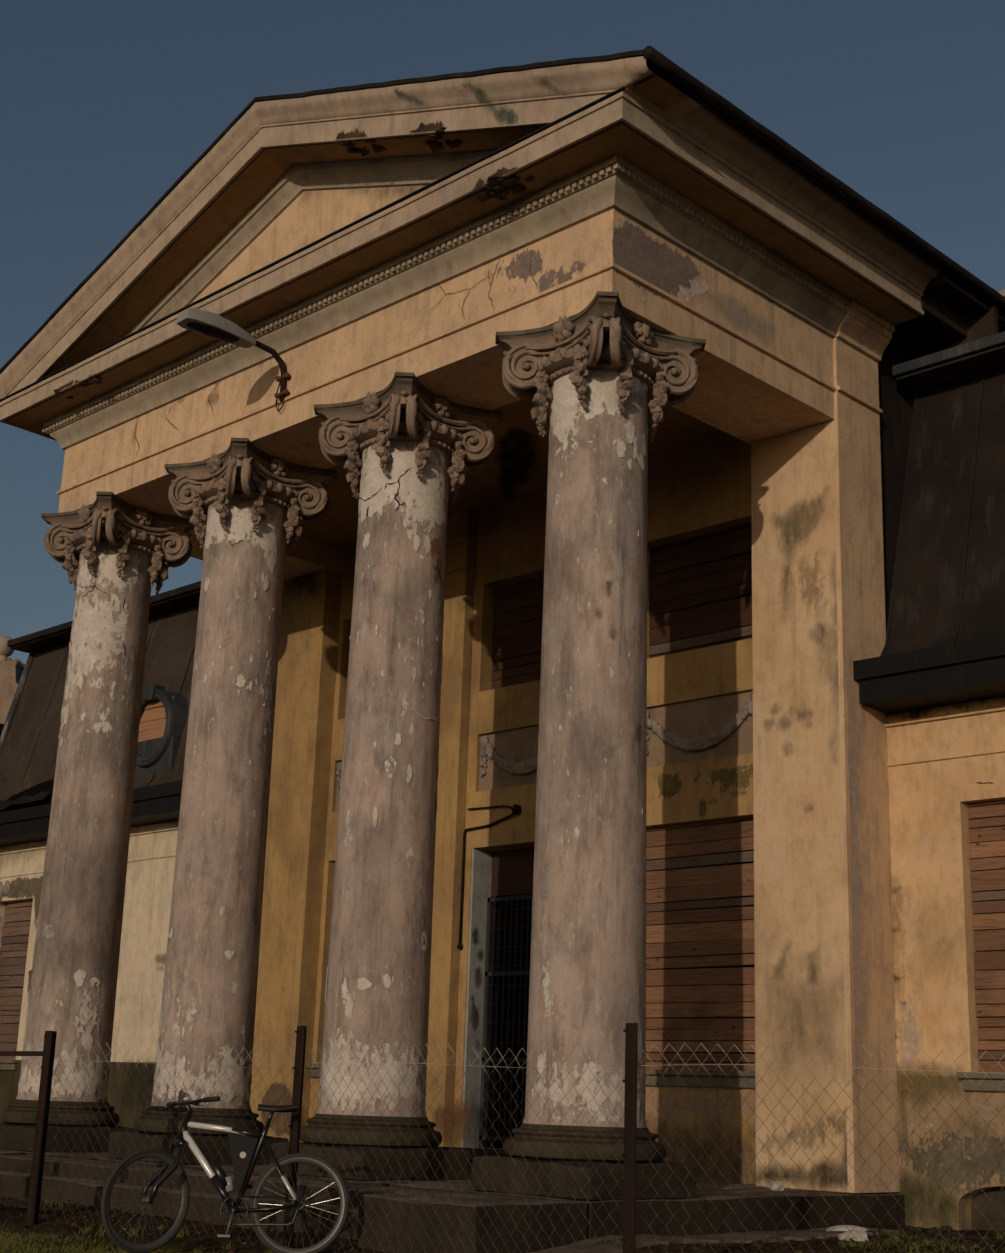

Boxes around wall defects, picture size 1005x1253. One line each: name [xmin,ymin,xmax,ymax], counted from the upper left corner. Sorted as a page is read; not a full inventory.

water stain [469,83,515,124]
crack [430,256,537,319]
flaking render [612,221,714,303]
peeling [549,370,648,478]
peeling [203,505,279,598]
crack [359,468,411,519]
water stain [780,499,821,552]
peeling [58,548,142,748]
peeling [357,441,446,784]
peeling [18,969,112,1099]
peeling [152,977,292,1137]
peeling [319,971,426,1113]